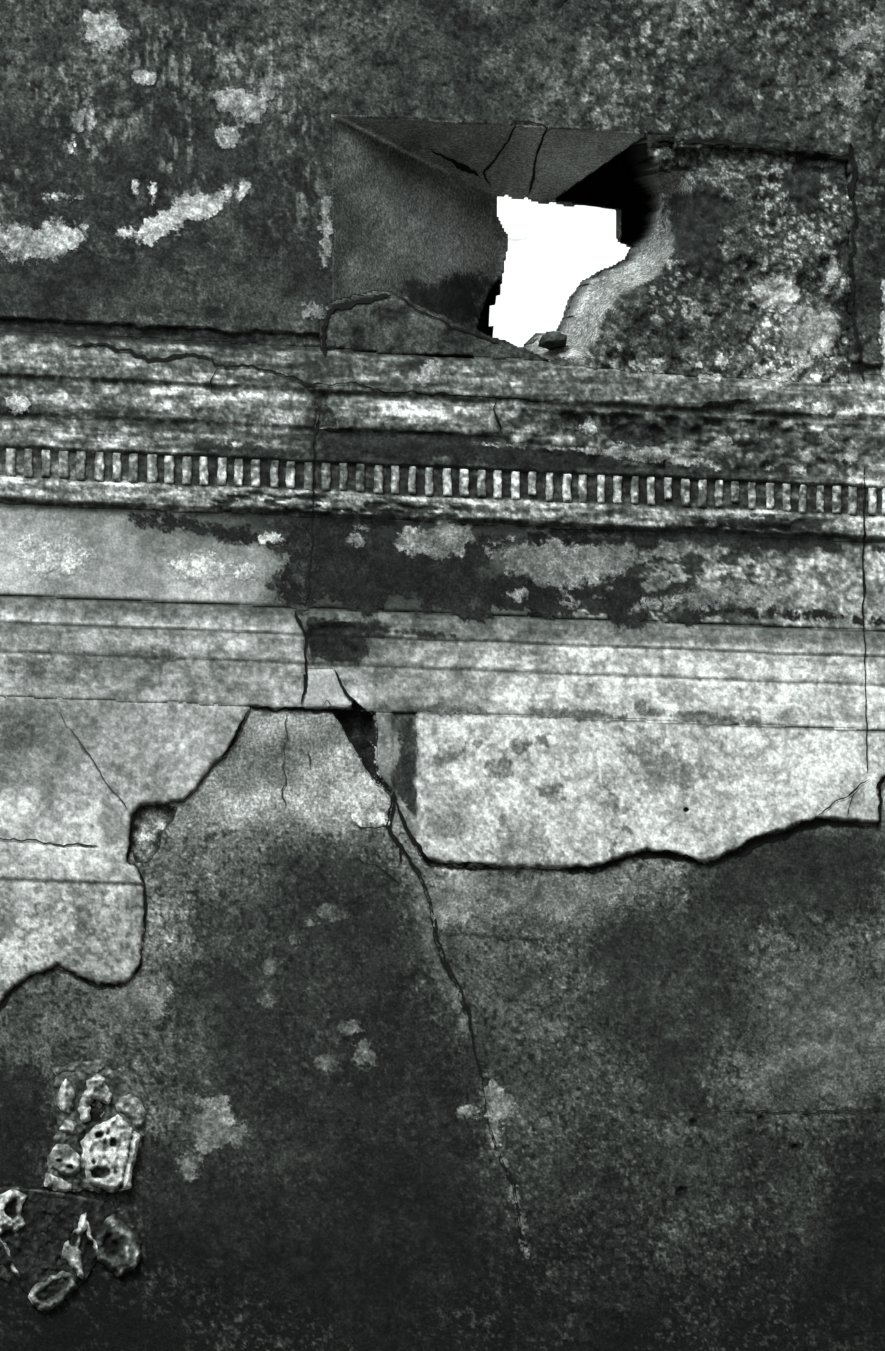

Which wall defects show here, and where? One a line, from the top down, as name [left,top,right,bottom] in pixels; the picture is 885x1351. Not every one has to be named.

damp [346,524,369,548]
damp [394,517,475,561]
damp [697,516,822,532]
damp [707,604,885,626]
spalling [303,621,393,797]
spalling [131,804,177,863]
damp [429,813,664,930]
crack [355,467,885,1253]
damp [313,1020,377,1074]
damp [747,939,885,1109]
damp [175,1094,247,1182]
damp [456,1072,530,1257]